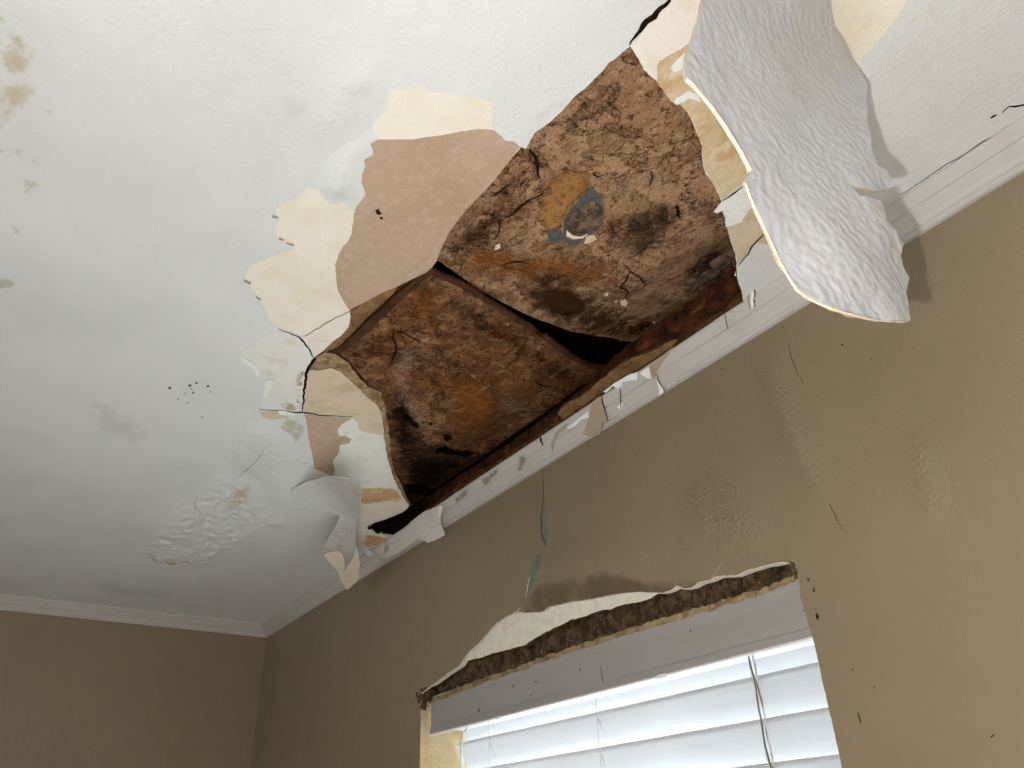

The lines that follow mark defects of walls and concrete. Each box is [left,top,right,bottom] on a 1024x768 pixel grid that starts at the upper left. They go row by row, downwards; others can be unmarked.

crack [629,0,671,45]
damp [0,14,55,198]
peeling [674,91,701,105]
peeling [538,170,605,247]
peeling [714,184,752,227]
peeling [242,85,520,488]
crack [259,311,353,420]
peeling [551,346,674,452]
peeling [364,505,445,558]
damp [519,568,707,613]
spalling [415,561,815,710]